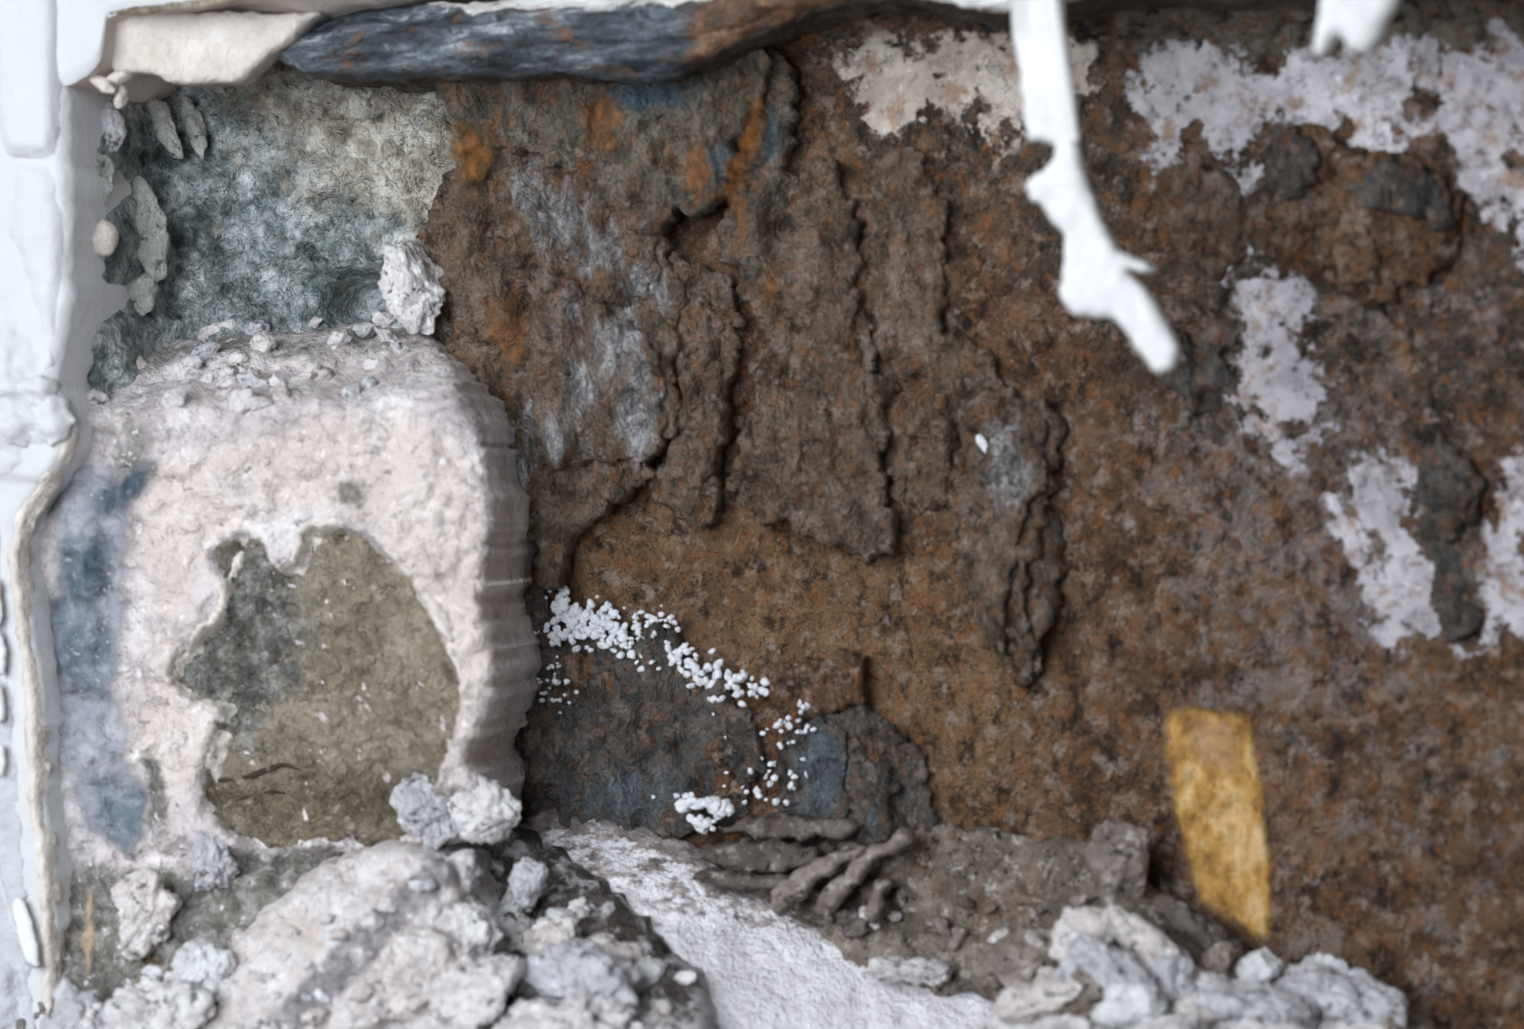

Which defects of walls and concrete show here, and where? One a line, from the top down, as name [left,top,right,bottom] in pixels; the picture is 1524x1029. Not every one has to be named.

peeling [89,0,330,109]
rust [450,121,493,184]
rust [1158,122,1467,315]
peeling [1124,17,1524,269]
spalling [165,518,460,850]
water stain [533,585,769,716]
peeling [415,29,1072,847]
water stain [673,699,817,834]
rust [1157,329,1248,446]
rust [1166,708,1270,936]
peeling [1323,443,1524,659]
rust [1415,430,1485,642]